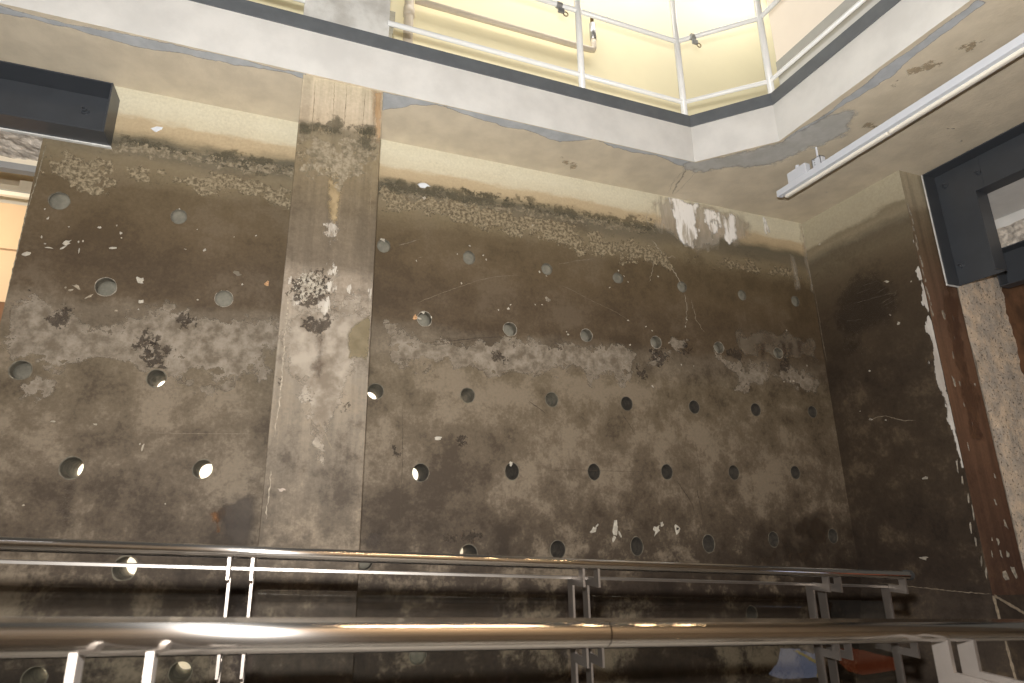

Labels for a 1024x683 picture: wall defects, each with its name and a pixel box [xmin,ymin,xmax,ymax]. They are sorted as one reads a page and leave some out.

damp [205,150,287,176]
damp [380,180,749,248]
damp [44,304,73,329]
damp [175,311,197,329]
damp [132,327,176,369]
peeling [2,259,372,464]
damp [636,348,670,380]
peeling [907,204,987,578]
spalling [612,520,644,556]